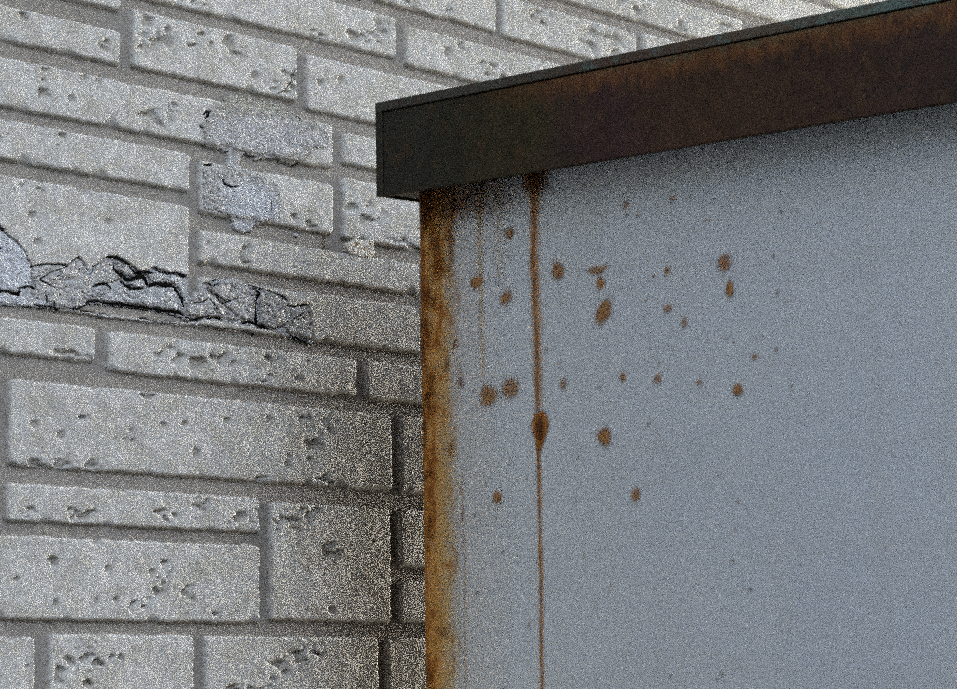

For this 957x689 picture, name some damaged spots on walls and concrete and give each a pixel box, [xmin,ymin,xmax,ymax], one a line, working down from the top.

spalling [0,231,314,345]
peeling [201,94,330,235]
corrosion [419,183,477,689]
corrosion [522,171,549,689]